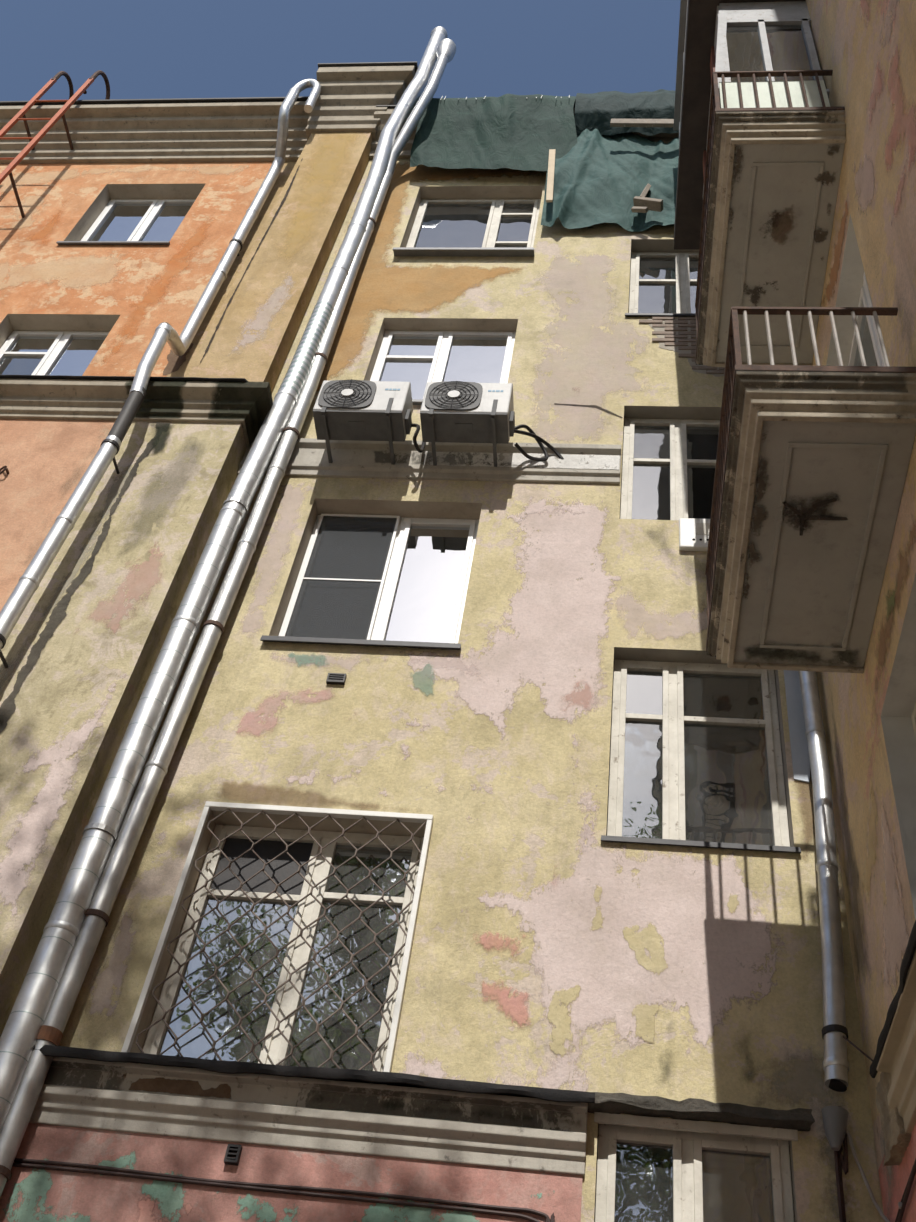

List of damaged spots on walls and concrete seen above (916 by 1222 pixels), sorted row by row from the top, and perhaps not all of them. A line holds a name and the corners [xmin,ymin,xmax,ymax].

spalling [732,147,743,185]
peeling [423,255,725,470]
peeling [408,496,708,745]
leakage [223,783,334,804]
peeling [478,792,783,1092]
peeling [401,1052,462,1080]
spalling [124,1075,231,1099]
peeling [97,1151,136,1175]
peeling [2,1158,90,1222]
peeling [137,1171,193,1222]
peeling [236,1193,300,1222]
peeling [353,1192,479,1222]